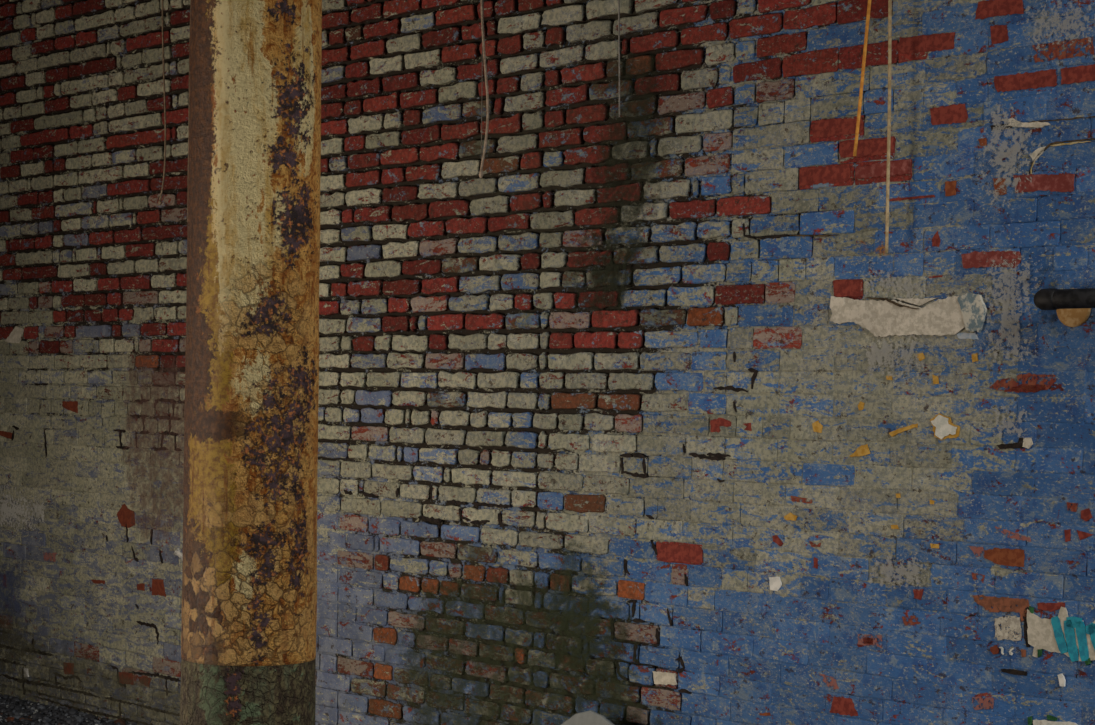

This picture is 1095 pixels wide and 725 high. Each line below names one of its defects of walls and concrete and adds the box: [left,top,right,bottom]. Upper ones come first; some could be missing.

corrosion [262,0,319,271]
peeling [833,279,863,297]
corrosion [237,282,318,664]
leakage [400,550,639,725]